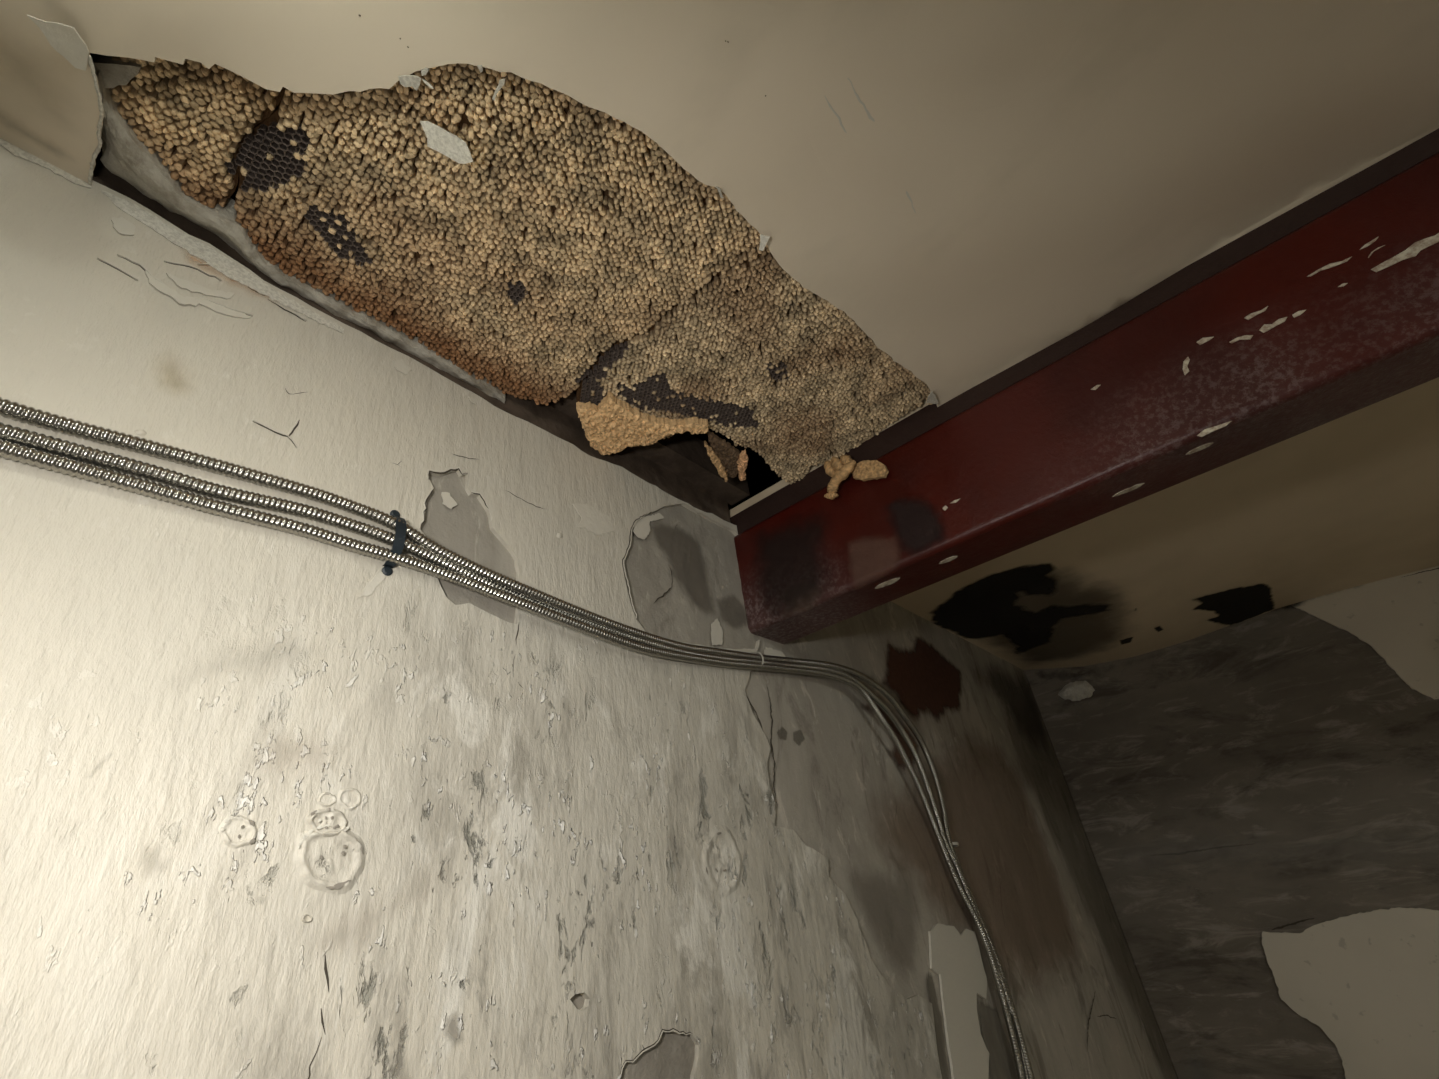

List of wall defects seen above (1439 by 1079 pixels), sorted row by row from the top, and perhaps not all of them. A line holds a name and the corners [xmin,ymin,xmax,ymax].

peeling [27,14,89,71]
peeling [398,68,434,91]
peeling [420,121,473,164]
peeling [0,138,344,334]
peeling [759,234,770,251]
peeling [420,472,516,580]
peeling [438,578,516,623]
damp [931,564,1107,652]
peeling [620,505,1439,1079]